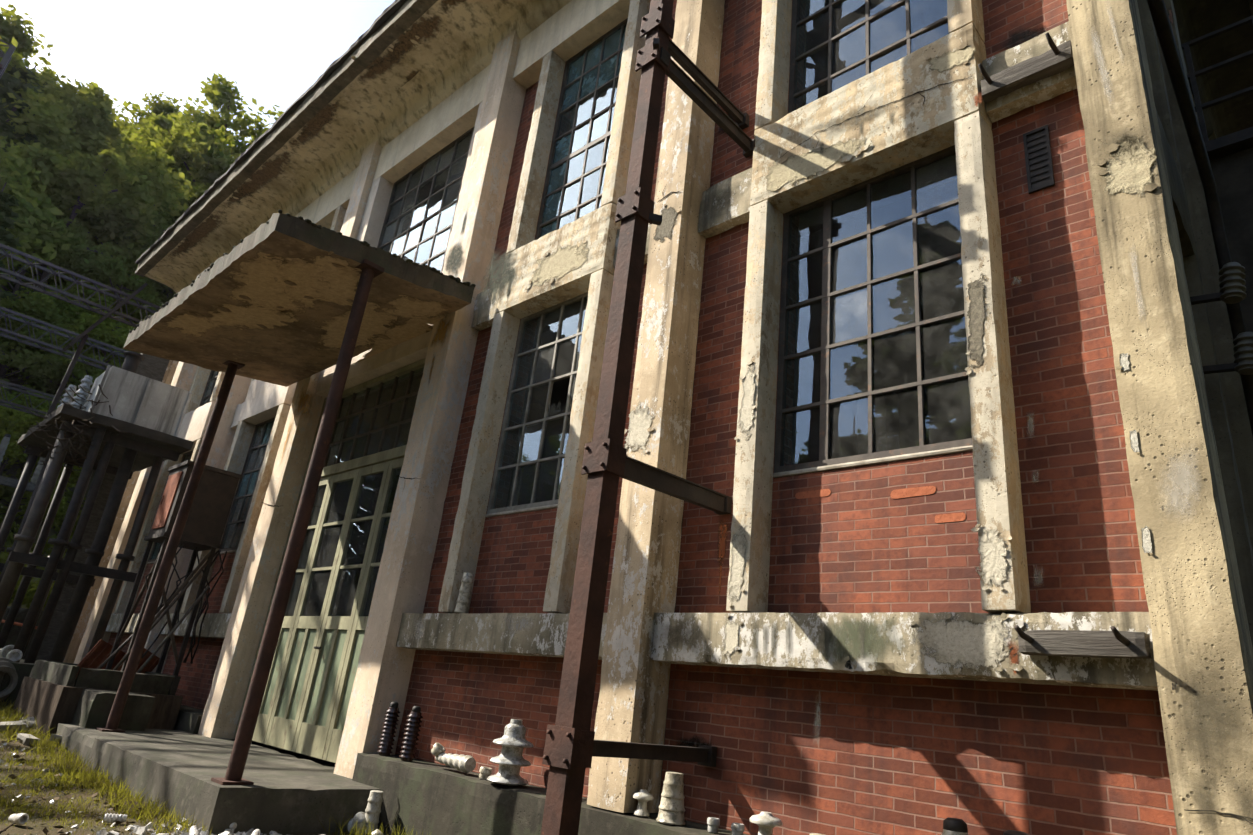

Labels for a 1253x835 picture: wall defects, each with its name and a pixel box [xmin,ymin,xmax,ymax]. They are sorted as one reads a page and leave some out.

crack [780,76,972,158]
damp [753,626,790,654]